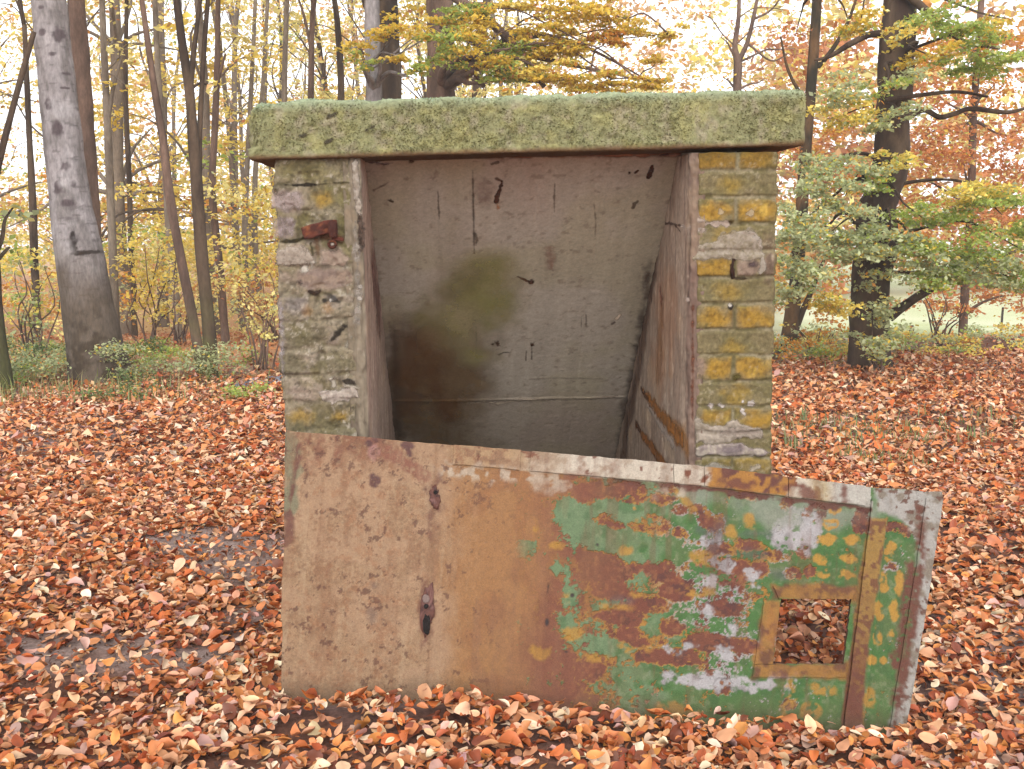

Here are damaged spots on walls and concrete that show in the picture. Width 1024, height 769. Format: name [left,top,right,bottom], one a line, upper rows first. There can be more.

water stain [388,320,541,446]
rust [635,421,666,463]
rust [640,386,688,454]